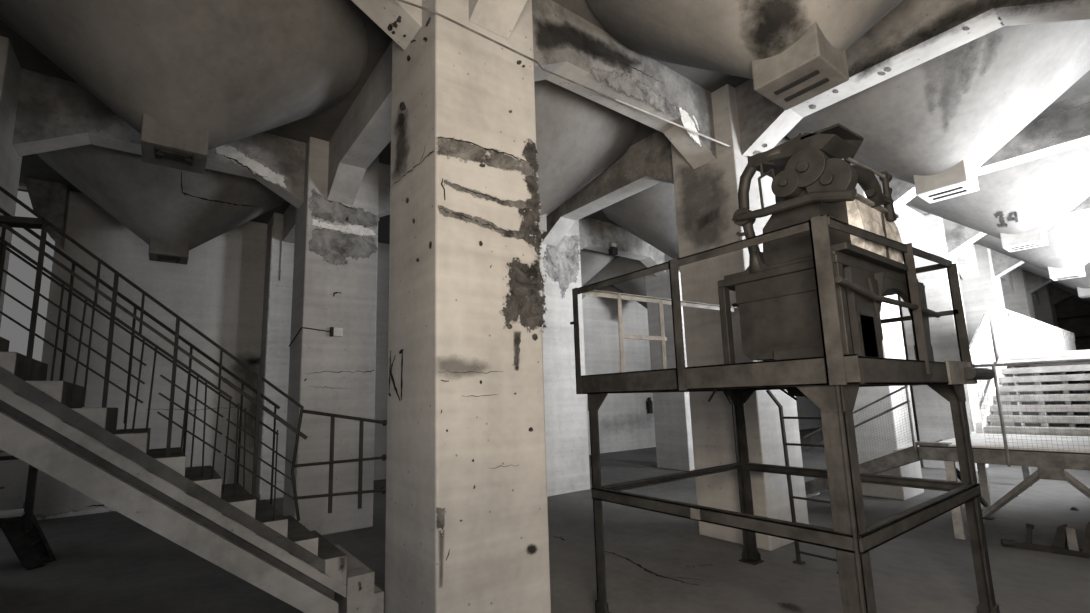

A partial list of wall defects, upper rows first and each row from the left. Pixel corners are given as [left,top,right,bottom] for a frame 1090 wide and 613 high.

peeling [215,145,287,188]
spalling [308,189,379,265]
peeling [437,137,581,371]
water stain [441,361,479,373]
crack [605,551,700,585]